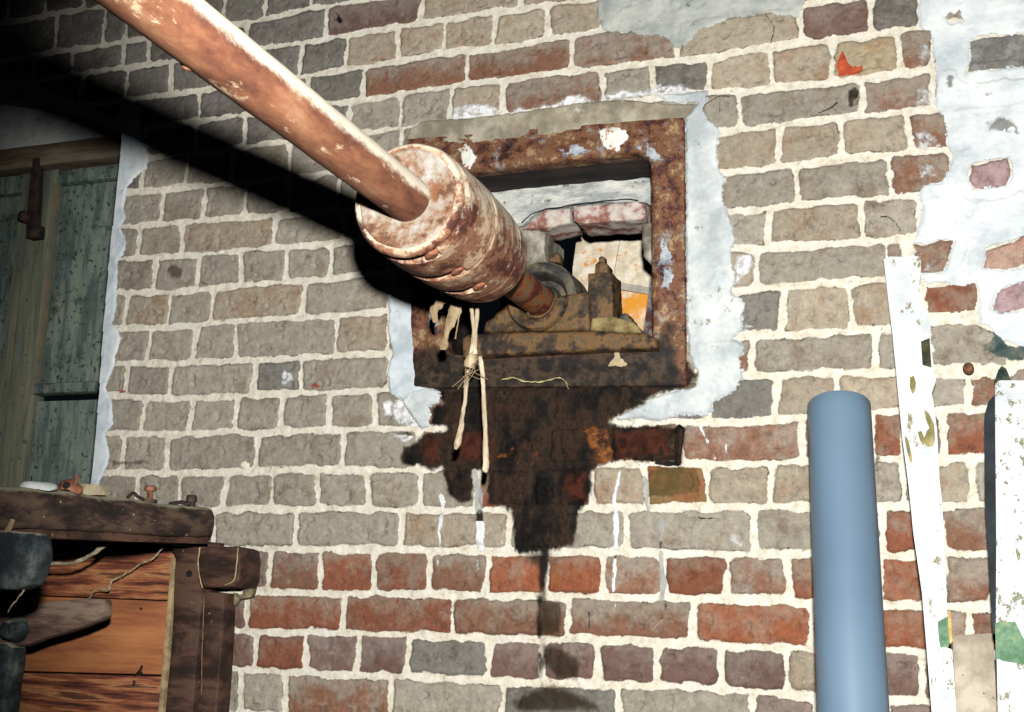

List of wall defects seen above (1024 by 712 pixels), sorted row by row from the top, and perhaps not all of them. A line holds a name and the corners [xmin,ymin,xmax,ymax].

peeling [911,0,1024,346]
rust [587,427,612,463]
leakage [517,545,597,710]